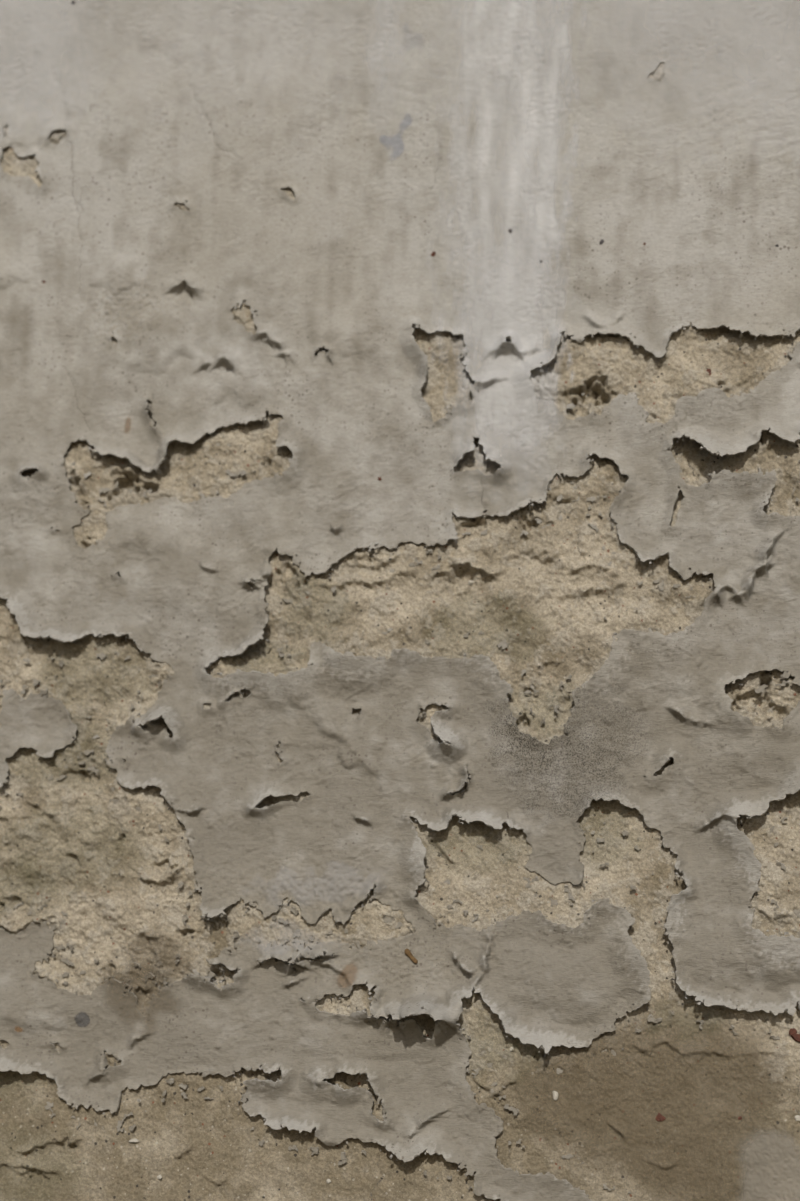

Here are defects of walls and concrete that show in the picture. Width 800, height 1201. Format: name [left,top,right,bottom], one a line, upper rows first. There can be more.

spalling [0,120,78,197]
peeling [12,462,50,482]
spalling [63,393,310,549]
spalling [189,301,800,744]
spalling [0,585,800,1201]